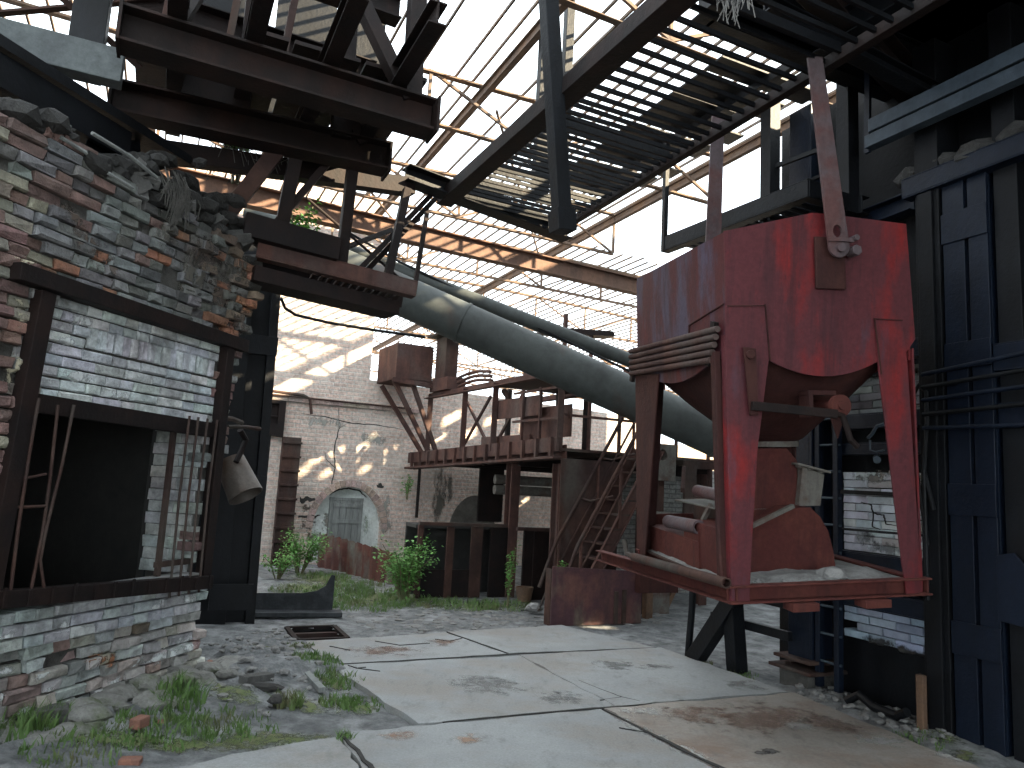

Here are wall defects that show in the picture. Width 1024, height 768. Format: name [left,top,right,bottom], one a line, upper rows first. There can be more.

crack [301,408,403,497]
leakage [433,469,452,522]
crack [861,502,896,530]
crack [337,733,375,768]